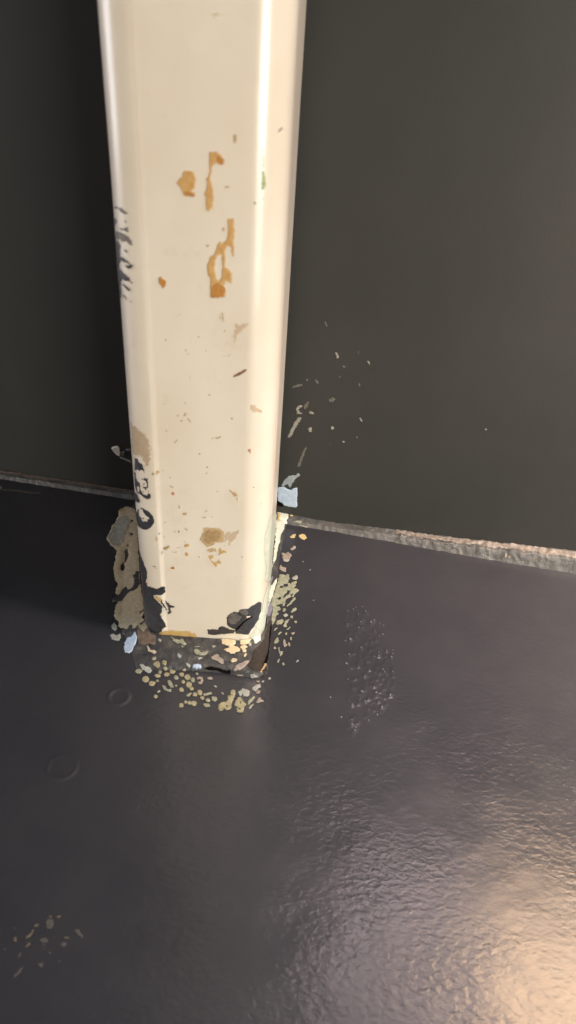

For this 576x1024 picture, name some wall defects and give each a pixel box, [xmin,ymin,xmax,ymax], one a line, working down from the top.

peeling [107,507,161,653]
peeling [271,487,311,665]
peeling [135,637,271,713]